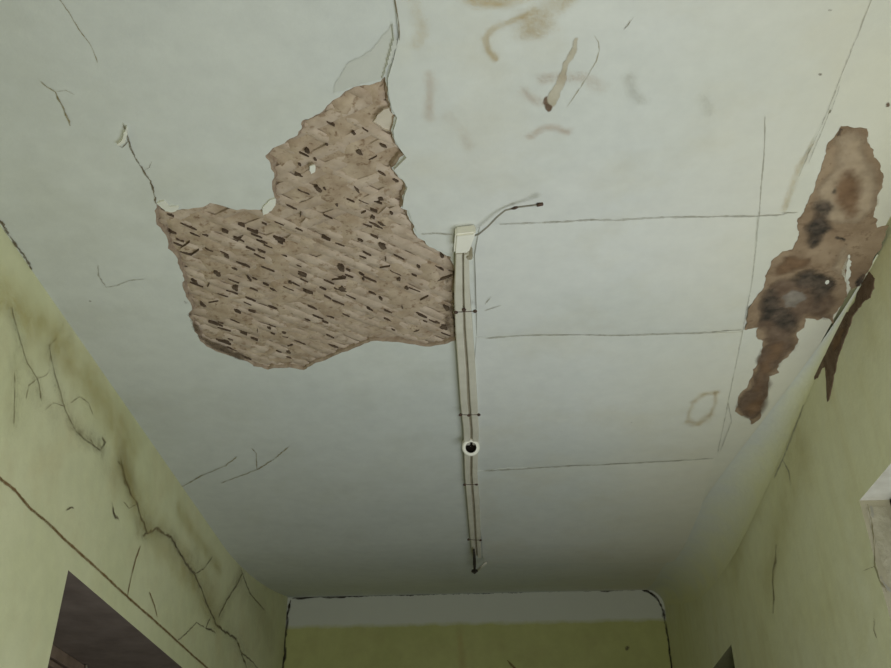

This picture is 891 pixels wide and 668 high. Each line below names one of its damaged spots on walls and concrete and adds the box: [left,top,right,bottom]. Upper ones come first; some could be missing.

crack [42,83,72,126]
water stain [516,37,606,112]
crack [120,128,157,204]
spalling [155,25,456,370]
peeling [735,126,889,424]
crack [12,308,106,451]
crack [182,448,288,487]
crack [0,462,263,668]
crack [282,593,503,668]